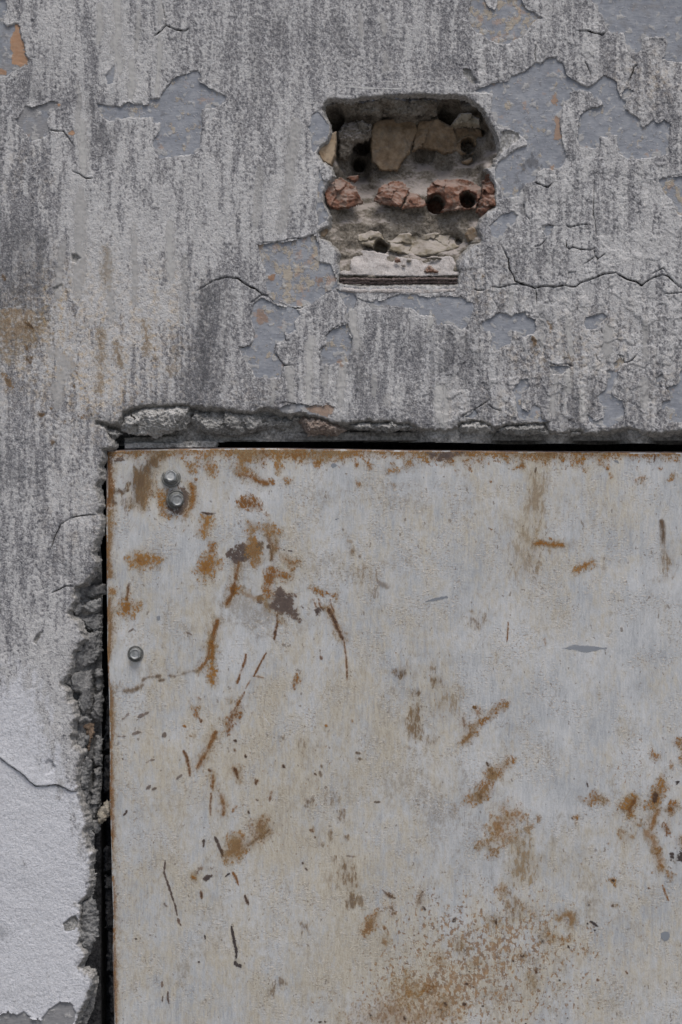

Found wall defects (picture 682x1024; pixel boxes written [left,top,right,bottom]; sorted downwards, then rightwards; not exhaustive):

peeling [0,0,29,77]
peeling [98,68,226,159]
crack [202,277,304,309]
spalling [256,58,670,366]
crack [474,183,682,302]
flaking render [107,355,682,450]
rust [108,450,680,687]
flaking render [0,544,115,1024]
rust [334,857,396,938]
rust [460,756,517,808]
rust [474,801,541,921]
rust [578,778,682,901]